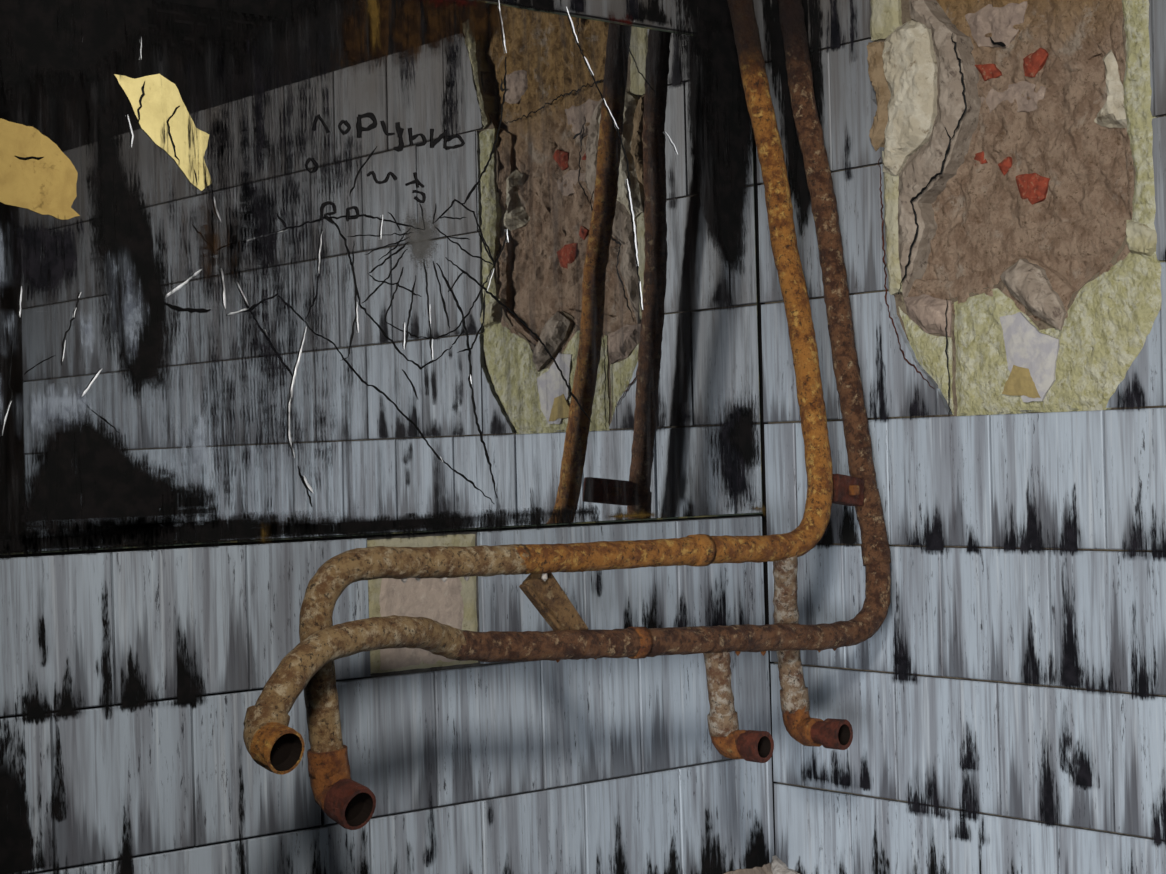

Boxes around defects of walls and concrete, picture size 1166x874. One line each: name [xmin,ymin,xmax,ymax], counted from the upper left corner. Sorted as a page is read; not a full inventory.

water stain [626,0,672,26]
spalling [867,0,1165,416]
water stain [909,507,945,555]
water stain [967,531,979,554]
water stain [998,484,1081,556]
water stain [891,584,917,683]
water stain [1021,574,1158,700]
water stain [1040,710,1100,828]
spalling [724,855,800,874]
water stain [872,816,889,874]